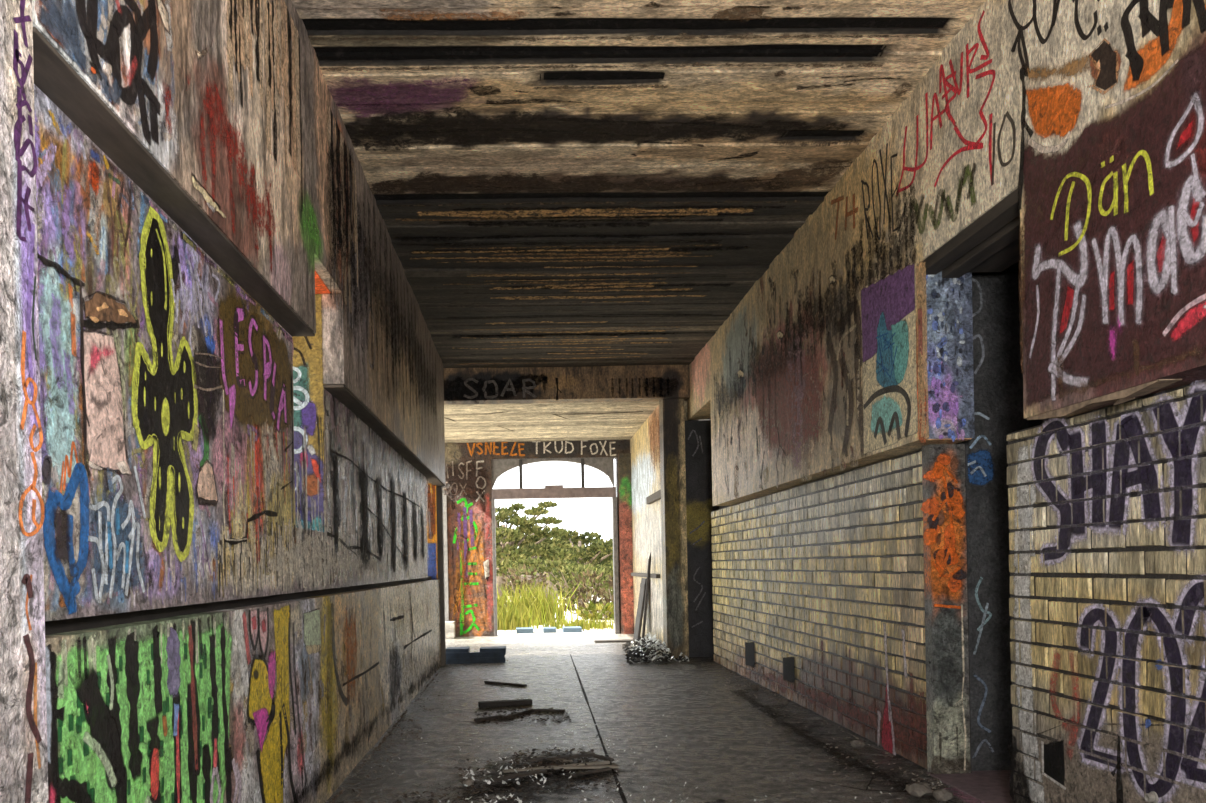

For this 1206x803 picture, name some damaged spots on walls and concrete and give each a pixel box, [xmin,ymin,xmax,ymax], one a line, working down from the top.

water stain [308,78,854,446]
water stain [714,183,918,455]